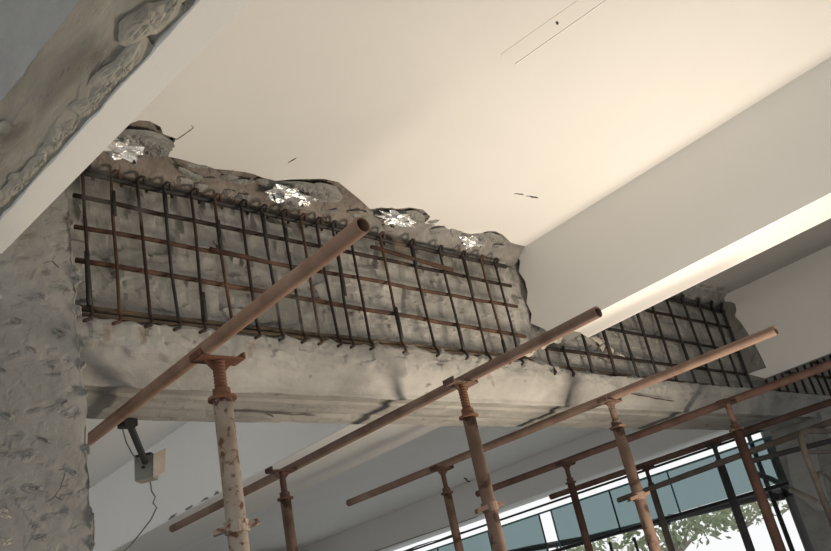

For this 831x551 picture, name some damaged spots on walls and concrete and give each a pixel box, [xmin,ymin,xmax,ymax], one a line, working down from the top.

spalling [60,120,527,361]
spalling [509,284,831,396]
spalling [87,506,96,551]